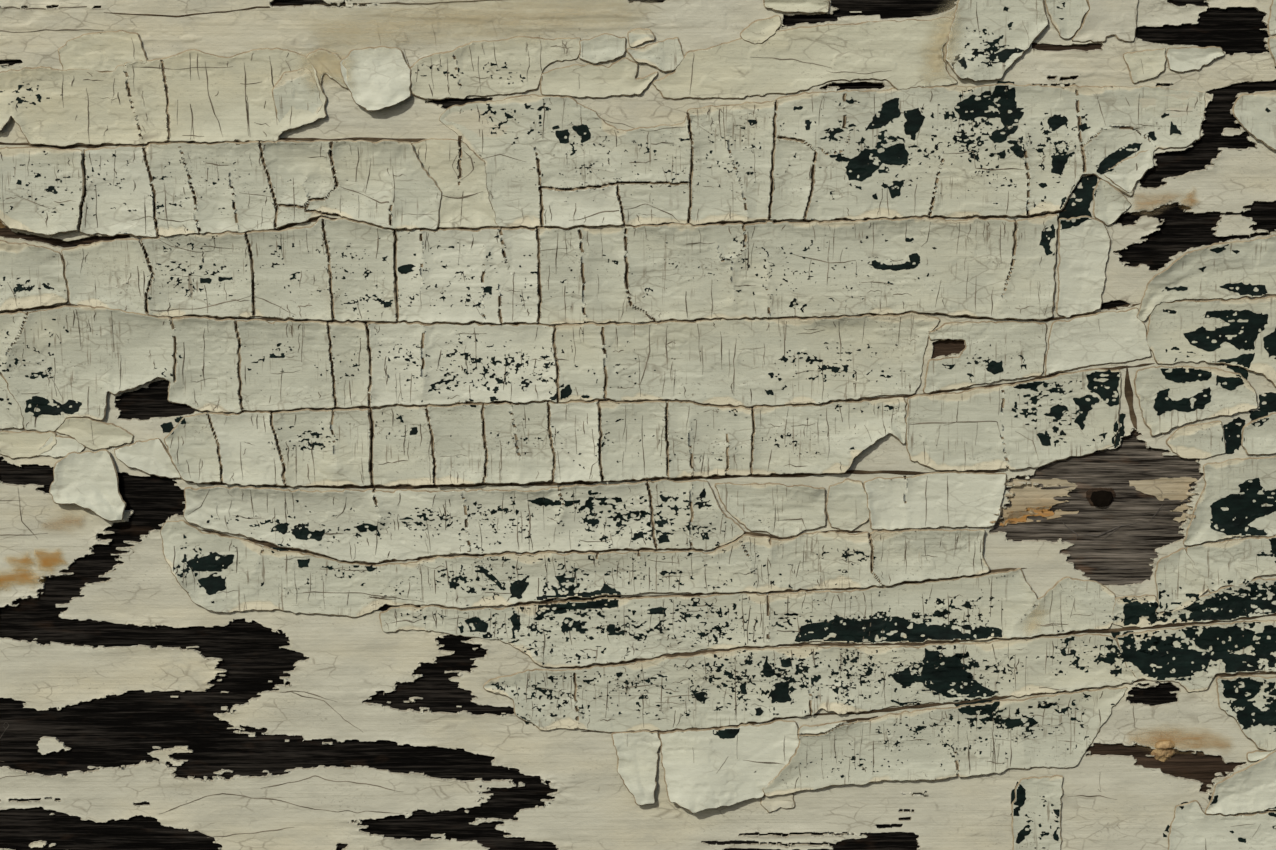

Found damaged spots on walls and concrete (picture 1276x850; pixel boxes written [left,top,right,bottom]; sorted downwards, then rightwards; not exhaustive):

crack [0,137,425,149]
crack [423,210,1066,230]
peeling [0,0,1276,488]
crack [147,312,540,325]
crack [856,303,1141,321]
crack [548,363,1155,433]
crack [189,470,1004,489]
crack [199,529,790,565]
crack [513,568,1025,605]
peeling [0,365,1276,850]
crack [548,613,1276,669]
crack [627,679,1149,733]